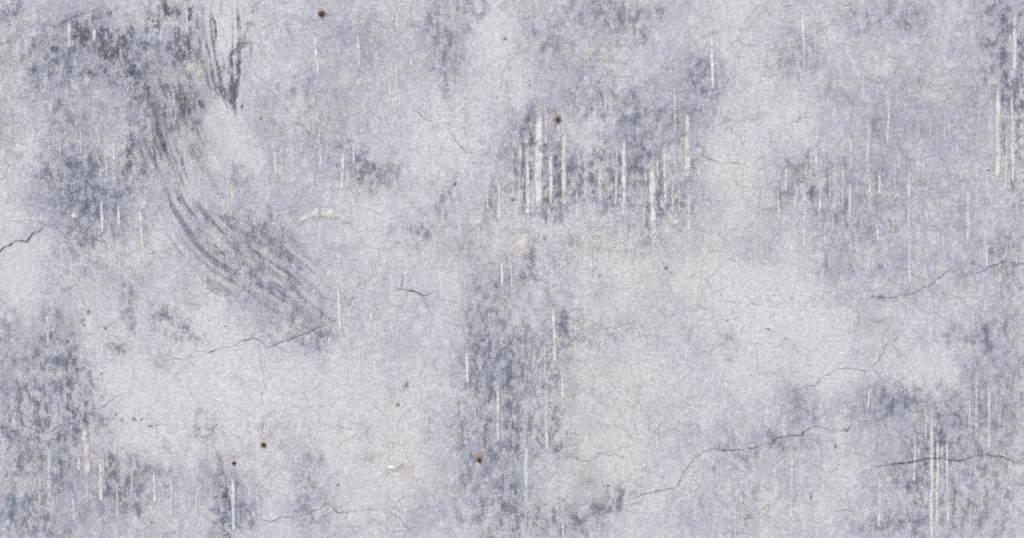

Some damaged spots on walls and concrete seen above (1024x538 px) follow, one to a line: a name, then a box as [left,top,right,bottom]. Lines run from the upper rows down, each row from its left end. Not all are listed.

damp [53,22,105,64]
damp [44,108,131,229]
damp [147,86,203,162]
damp [477,107,705,248]
damp [797,133,863,258]
damp [986,75,1024,198]
damp [8,449,51,524]
damp [33,341,87,419]
damp [465,346,530,446]
damp [501,308,571,538]
damp [899,408,971,538]
crack [891,454,1015,465]